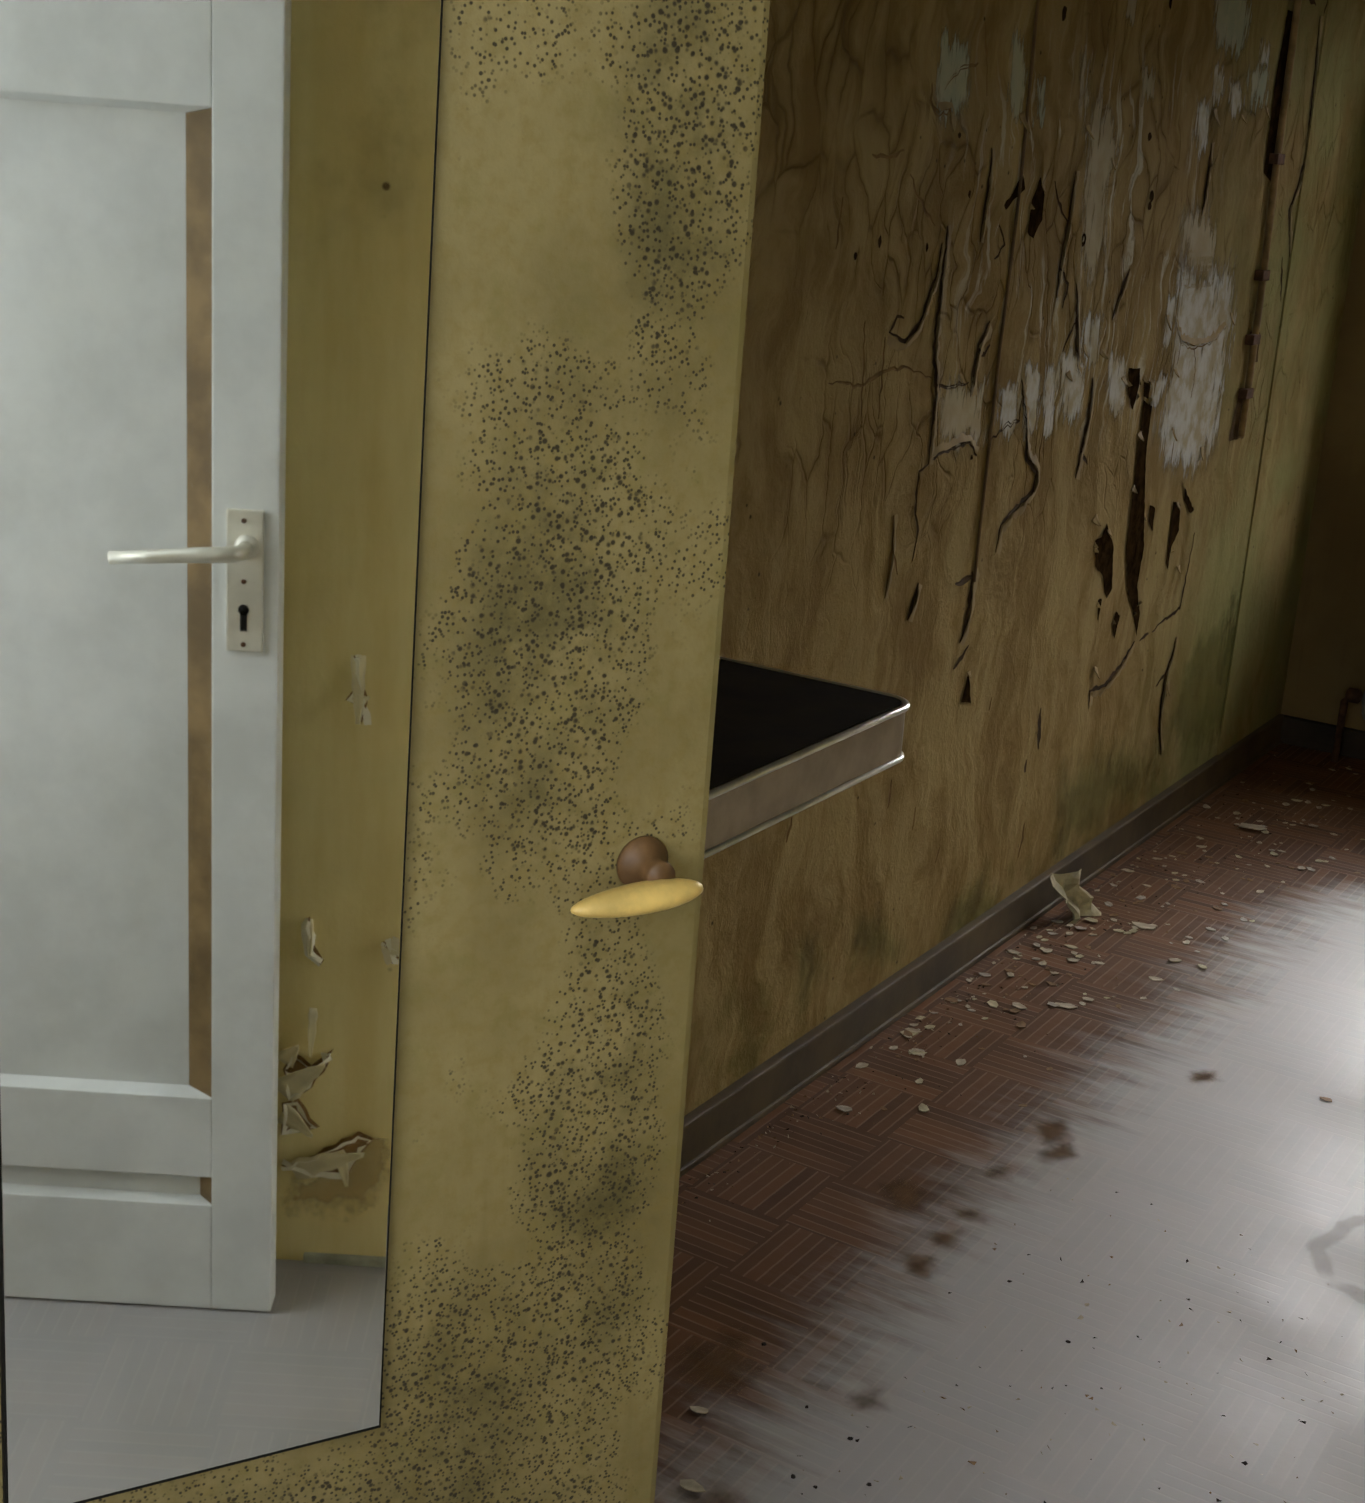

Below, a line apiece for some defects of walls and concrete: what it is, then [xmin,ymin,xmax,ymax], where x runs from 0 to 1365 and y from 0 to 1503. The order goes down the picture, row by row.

peeling [935,27,970,132]
spalling [1004,174,1046,238]
peeling [1010,30,1046,133]
peeling [1080,44,1119,286]
crack [1202,142,1215,216]
peeling [1192,0,1293,181]
crack [1280,0,1328,297]
crack [828,148,1132,670]
peeling [936,206,1260,638]
crack [1175,316,1226,397]
crack [1088,533,1195,755]
crack [1024,708,1041,773]